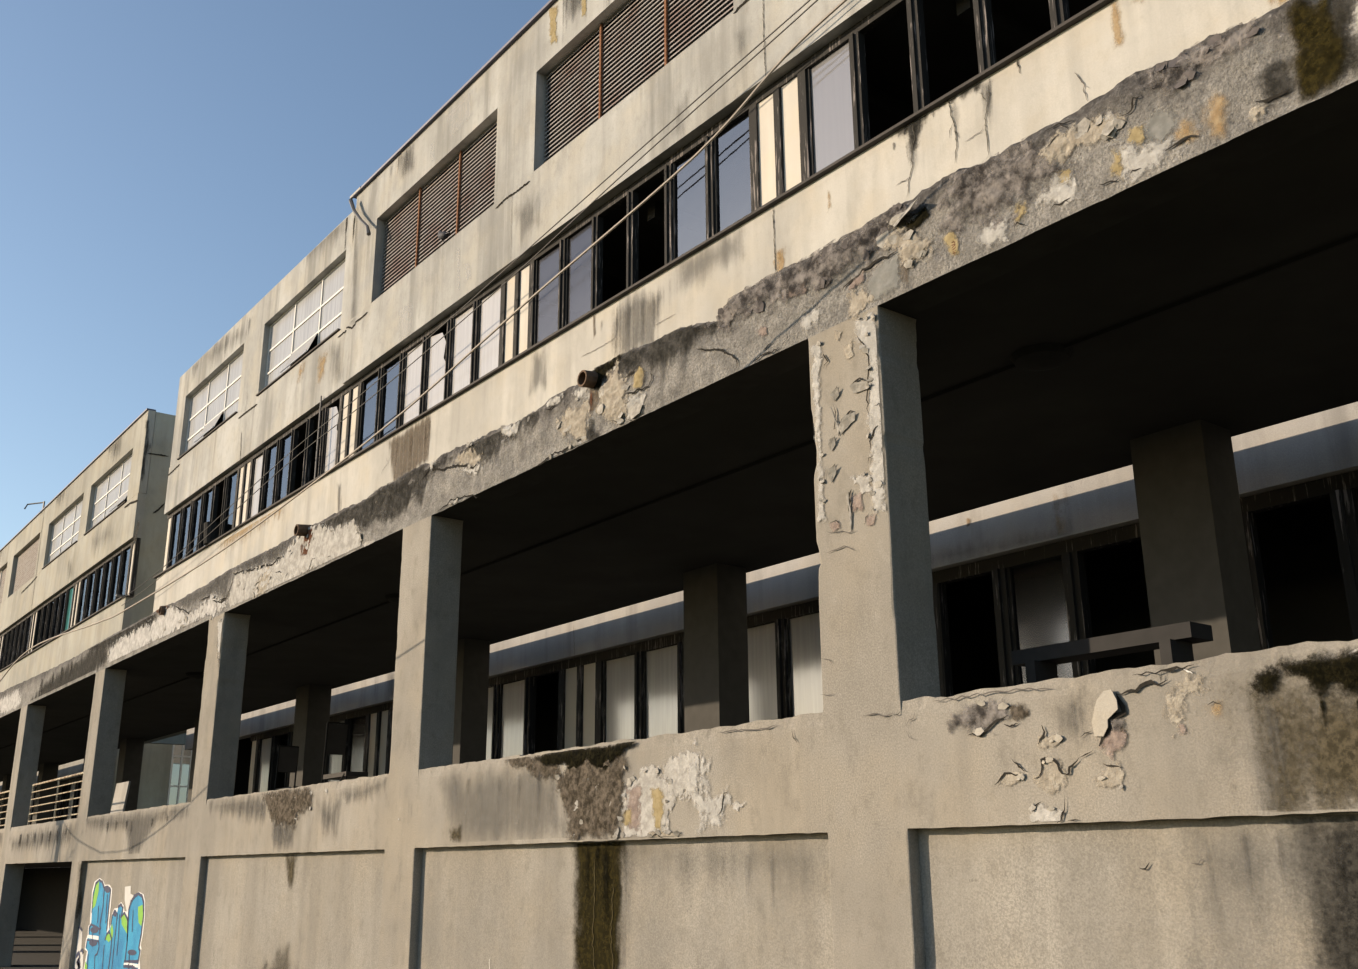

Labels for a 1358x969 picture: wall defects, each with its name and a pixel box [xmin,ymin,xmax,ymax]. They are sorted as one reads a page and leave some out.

crack [897,83,990,195]
crack [1045,73,1089,149]
spalling [1145,17,1260,95]
spalling [1249,60,1300,121]
spalling [704,112,1126,531]
peeling [455,438,481,474]
spalling [547,360,646,459]
peeling [107,519,375,667]
spalling [947,699,1029,737]
spalling [505,741,745,840]
peeling [995,725,1068,822]
water stain [1307,814,1358,969]